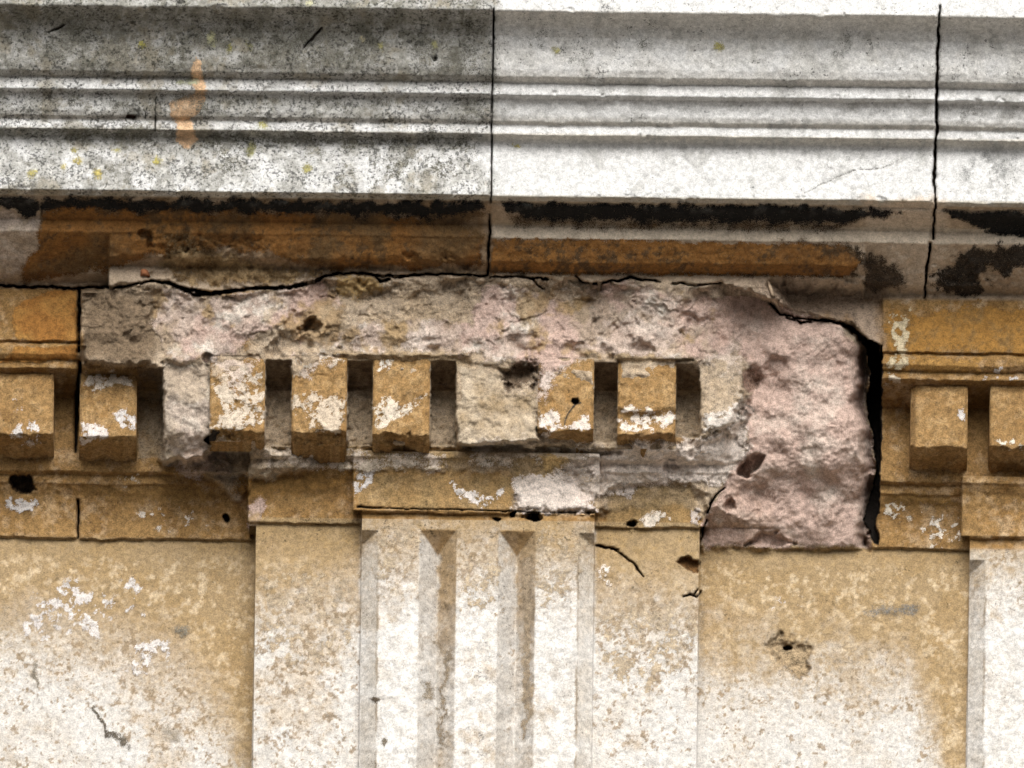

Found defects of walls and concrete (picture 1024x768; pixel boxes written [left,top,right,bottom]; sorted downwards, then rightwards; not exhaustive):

rust [169,57,208,149]
crack [924,11,940,296]
crack [0,8,549,452]
leakage [501,198,902,228]
leakage [849,244,907,294]
leakage [929,209,1024,299]
crack [770,303,877,356]
peeling [84,368,133,391]
peeling [78,421,109,446]
peeling [112,409,137,431]
spalling [148,225,876,616]
crack [596,544,643,577]